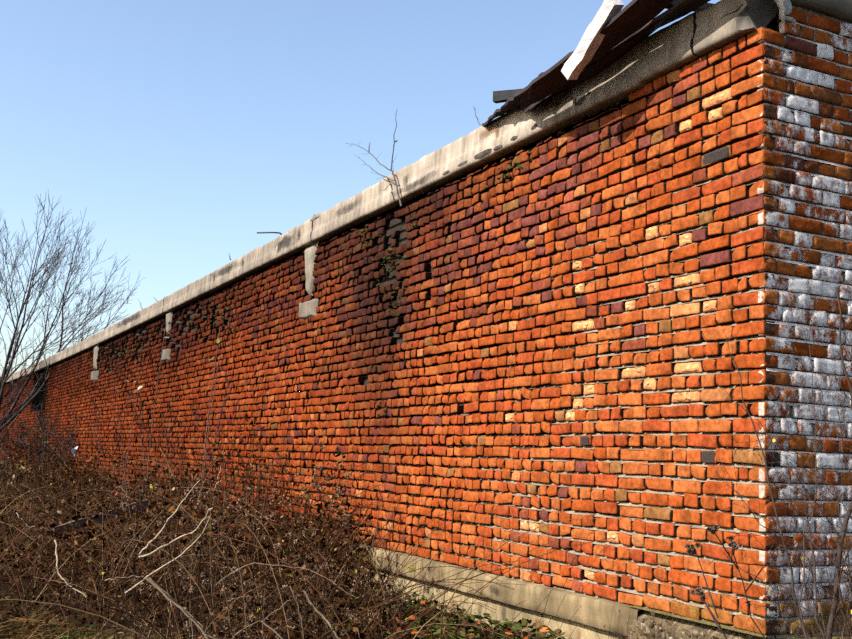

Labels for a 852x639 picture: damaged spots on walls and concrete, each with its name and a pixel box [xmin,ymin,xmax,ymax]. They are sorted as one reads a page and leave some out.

crack [689,13,697,56]